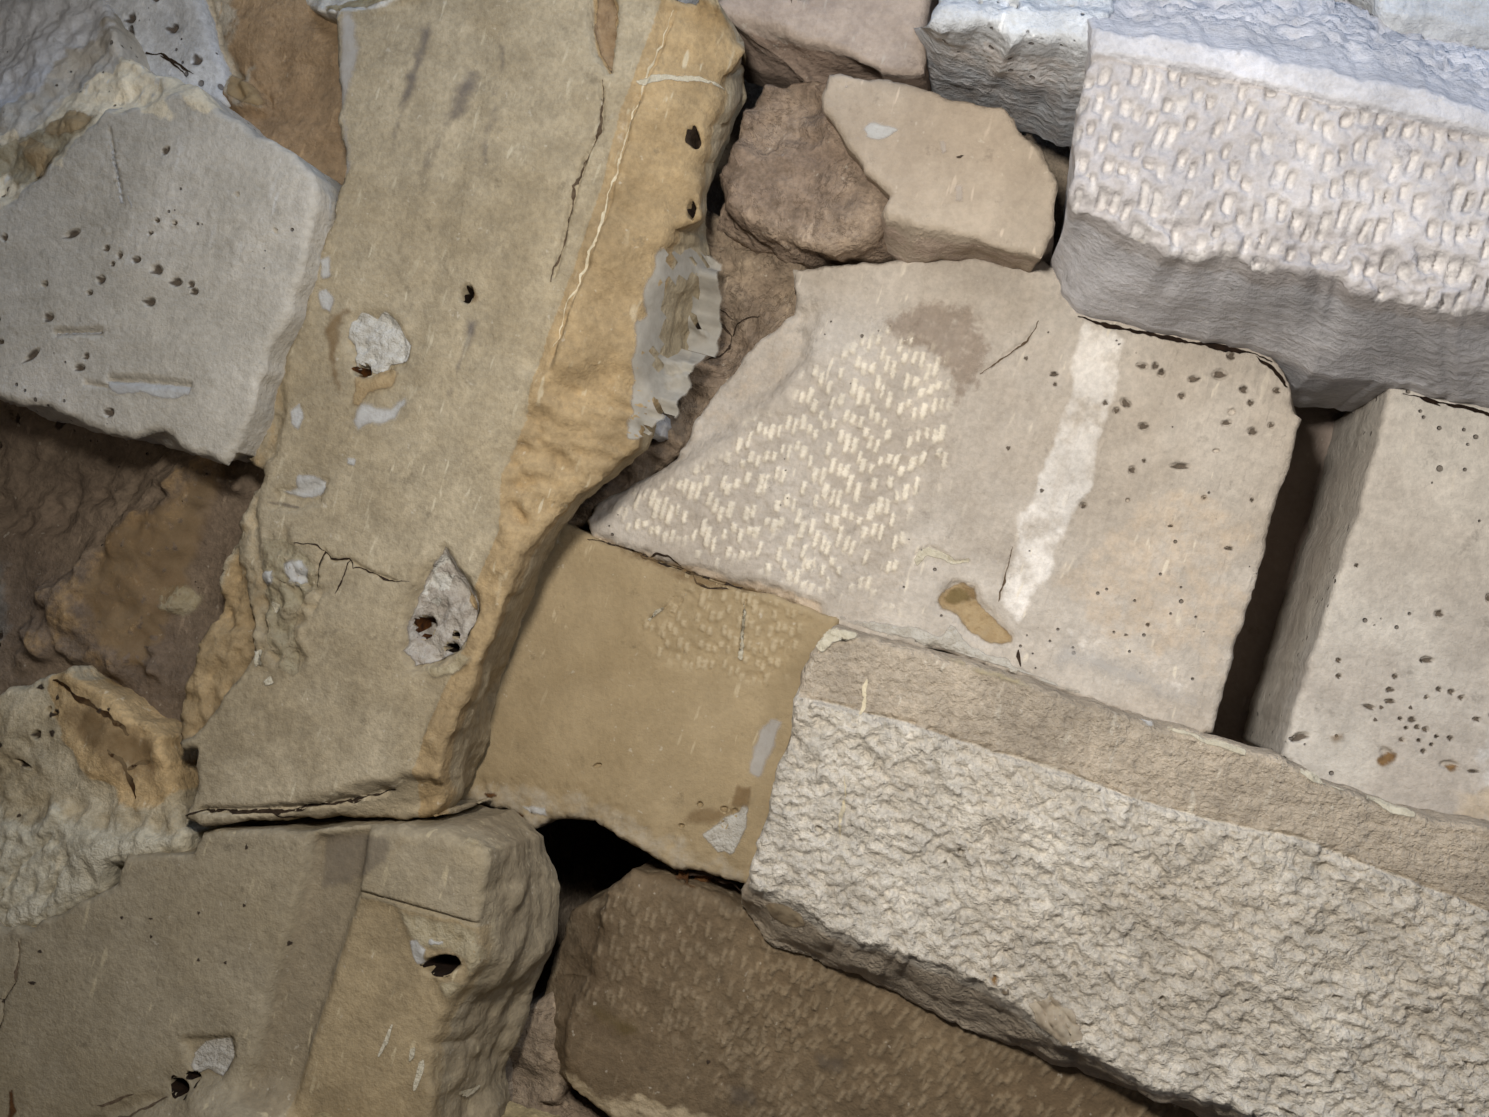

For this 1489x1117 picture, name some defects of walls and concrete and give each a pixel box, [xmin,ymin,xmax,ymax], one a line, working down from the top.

spalling [319,257,411,427]
peeling [291,405,303,427]
crack [280,542,409,593]
spalling [404,547,479,677]
crack [53,679,148,799]
crack [185,789,396,818]
crack [0,941,20,1027]
spalling [186,1038,234,1088]